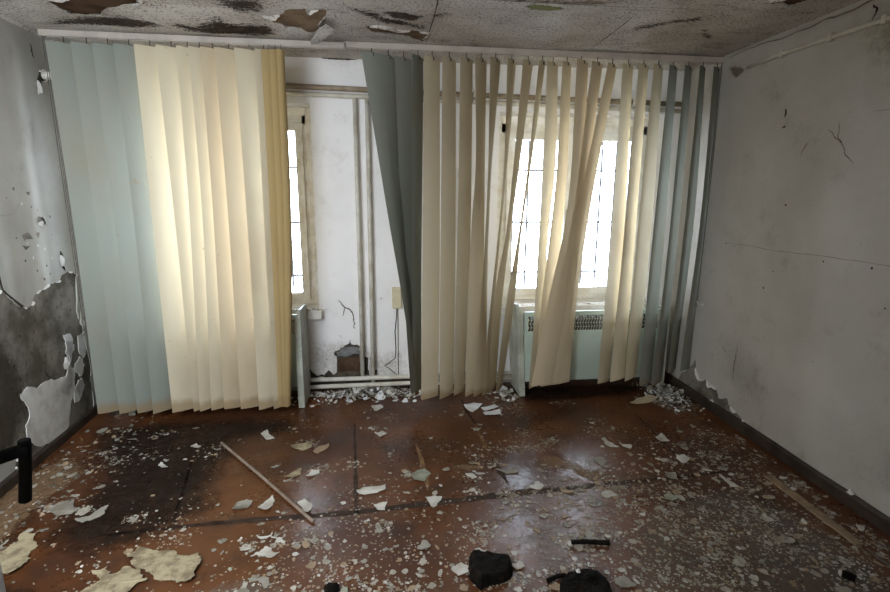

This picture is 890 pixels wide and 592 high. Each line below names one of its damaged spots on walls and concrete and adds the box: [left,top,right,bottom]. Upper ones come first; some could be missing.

peeling [49,0,143,16]
leakage [52,0,273,36]
peeling [263,9,326,32]
leakage [354,8,451,32]
leakage [634,16,712,38]
crack [828,123,853,163]
crack [3,289,24,309]
flaking render [0,191,94,456]
flaking render [310,335,410,390]
flaking render [679,361,745,422]